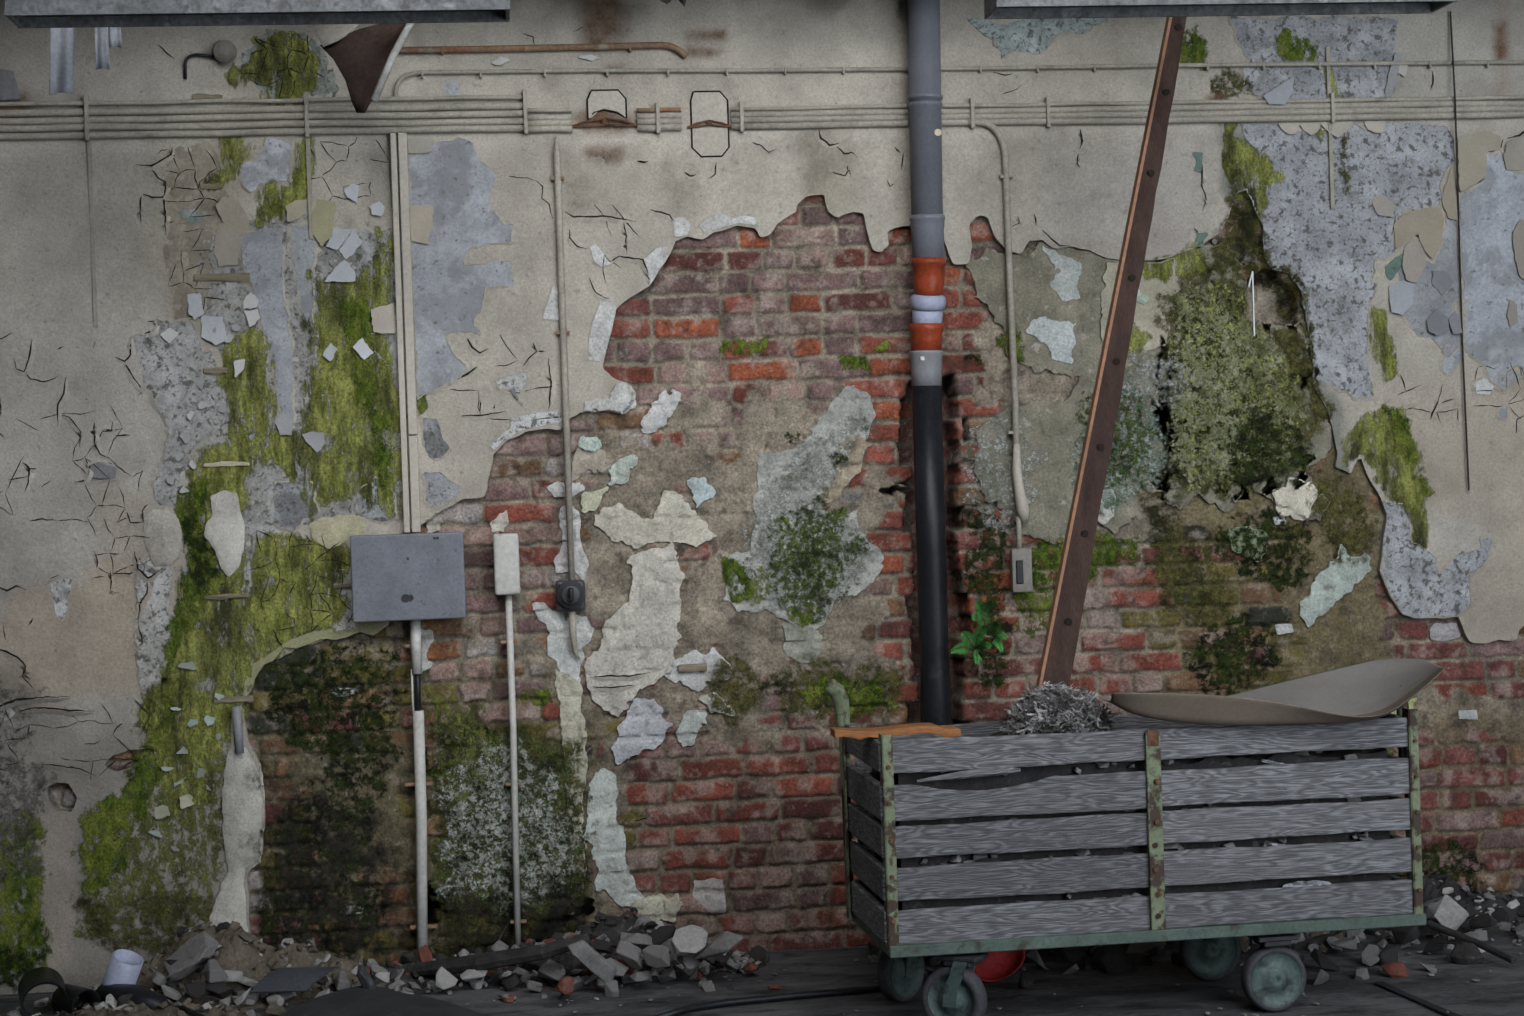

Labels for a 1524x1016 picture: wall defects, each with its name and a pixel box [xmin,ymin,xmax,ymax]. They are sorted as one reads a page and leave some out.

crack [509,176,673,301]
crack [684,162,719,180]
crack [752,142,778,156]
peeling [1192,152,1203,173]
peeling [1195,14,1524,403]
crack [451,335,558,421]
crack [1398,363,1524,433]
crack [0,147,228,778]
flaking render [127,133,921,965]
flaking render [942,216,1524,897]
leakage [257,794,414,957]
leakage [448,887,585,952]